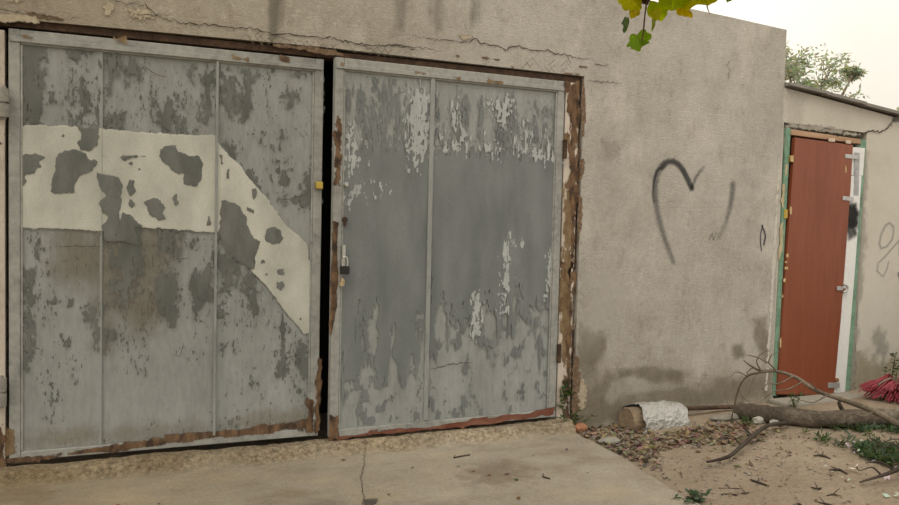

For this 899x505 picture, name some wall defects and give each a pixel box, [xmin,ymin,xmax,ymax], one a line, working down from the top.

crack [115,0,615,83]
corrosion [558,80,581,418]
water stain [579,169,781,421]